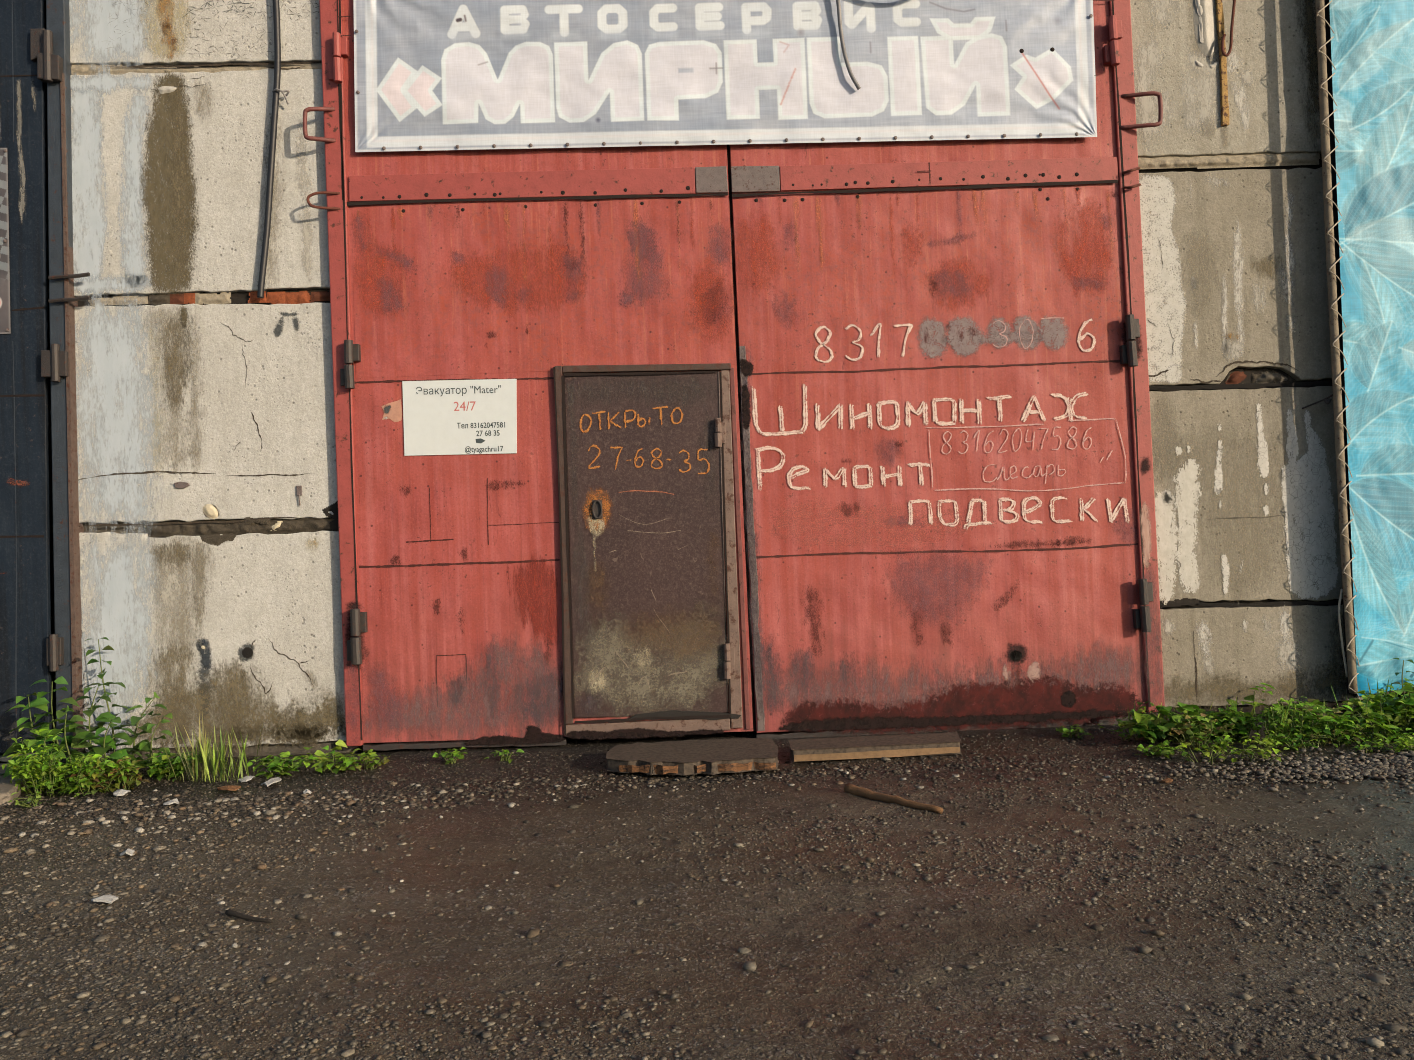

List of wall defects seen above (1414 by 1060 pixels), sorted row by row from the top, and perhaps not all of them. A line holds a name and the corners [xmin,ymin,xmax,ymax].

corrosion [146,0,187,58]
damp [140,71,211,468]
peeling [69,0,339,743]
peeling [1139,174,1186,384]
spalling [1216,360,1297,384]
corrosion [583,488,611,554]
peeling [1281,409,1339,600]
damp [150,544,400,749]
crack [250,638,316,694]